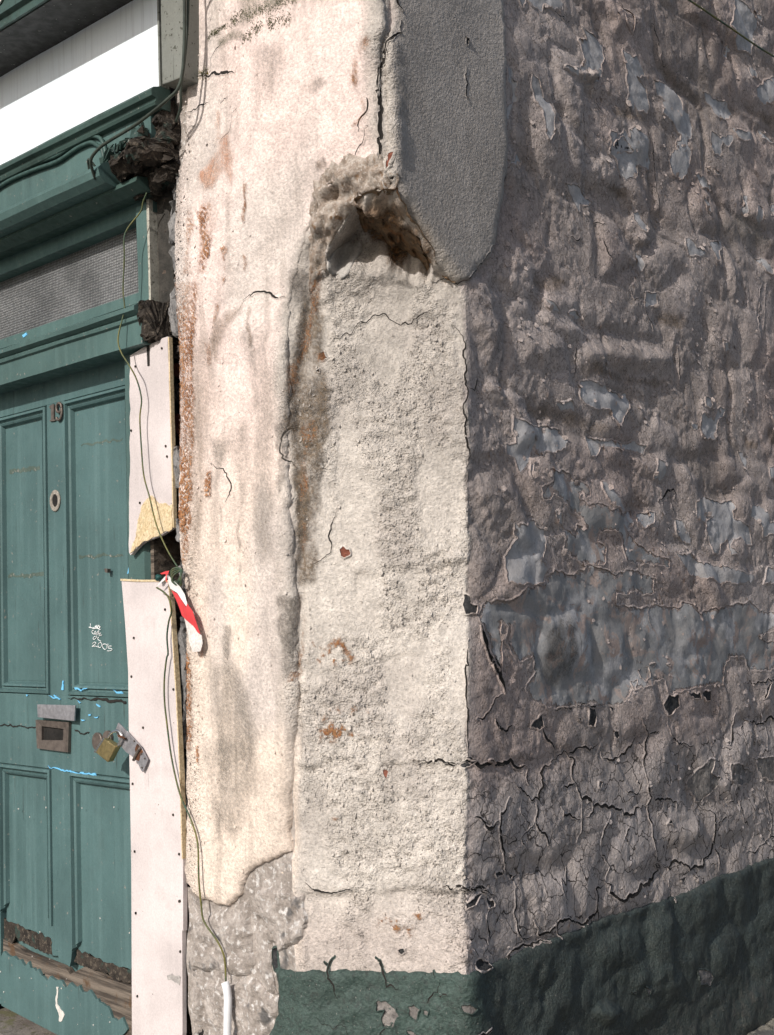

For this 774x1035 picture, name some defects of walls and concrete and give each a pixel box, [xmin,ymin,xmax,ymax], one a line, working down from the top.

crack [354,0,404,158]
spalling [174,87,232,868]
peeling [291,0,774,974]
spalling [272,945,281,973]
crack [417,624,774,960]